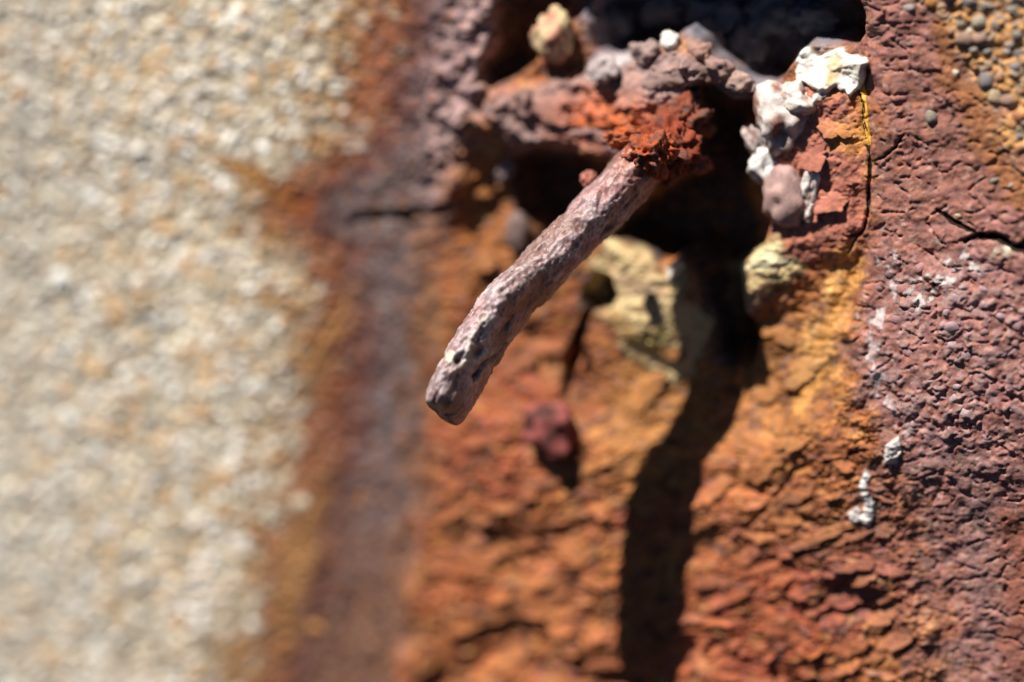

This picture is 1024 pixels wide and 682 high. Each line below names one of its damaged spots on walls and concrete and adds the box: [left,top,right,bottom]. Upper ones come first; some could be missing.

corrosion [207,0,1024,682]
spalling [410,0,882,414]
crack [935,210,1024,254]